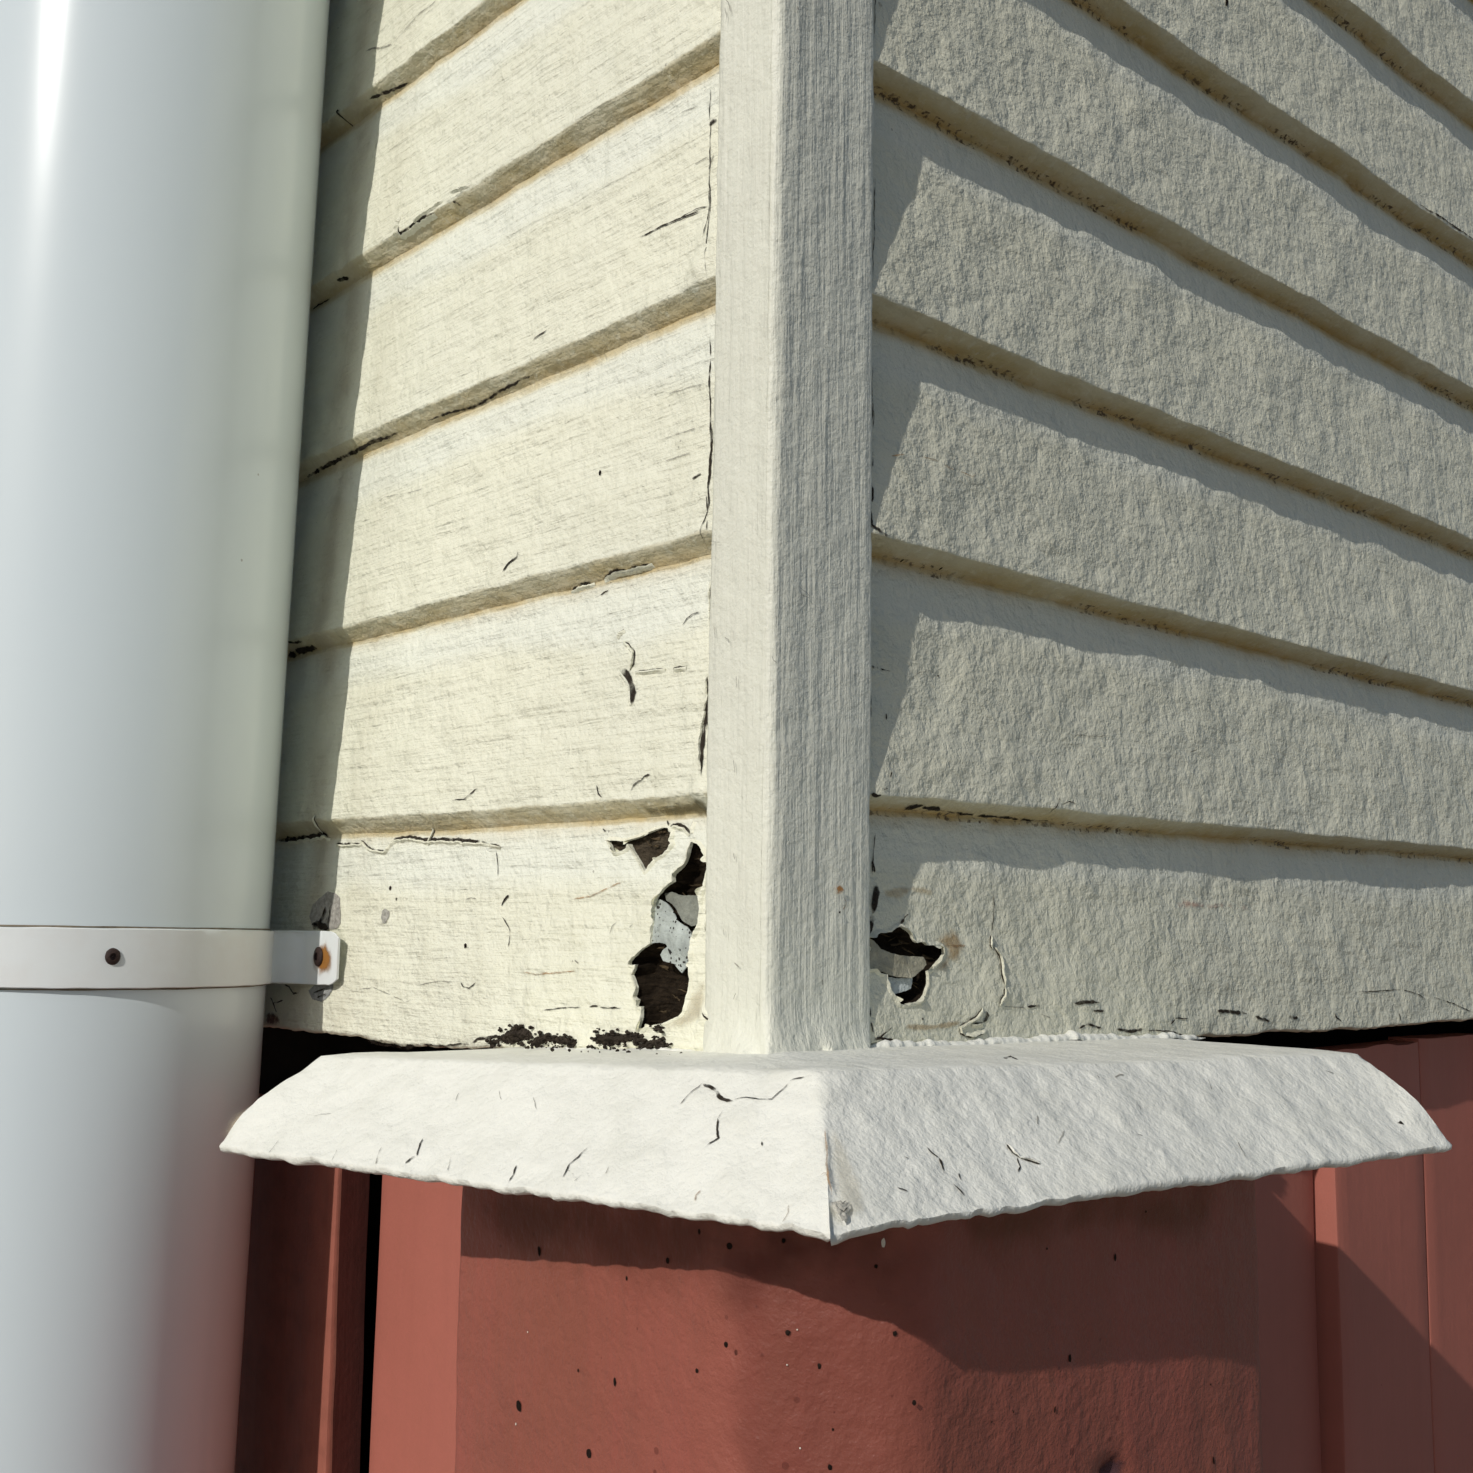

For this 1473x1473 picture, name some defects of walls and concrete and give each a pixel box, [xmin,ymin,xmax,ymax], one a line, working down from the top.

crack [571,563,655,595]
crack [616,629,737,772]
rust [318,946,330,971]
peeling [605,824,706,1034]
peeling [869,922,946,1009]
crack [952,897,1298,1060]
crack [1335,989,1470,1021]
crack [681,1077,802,1144]